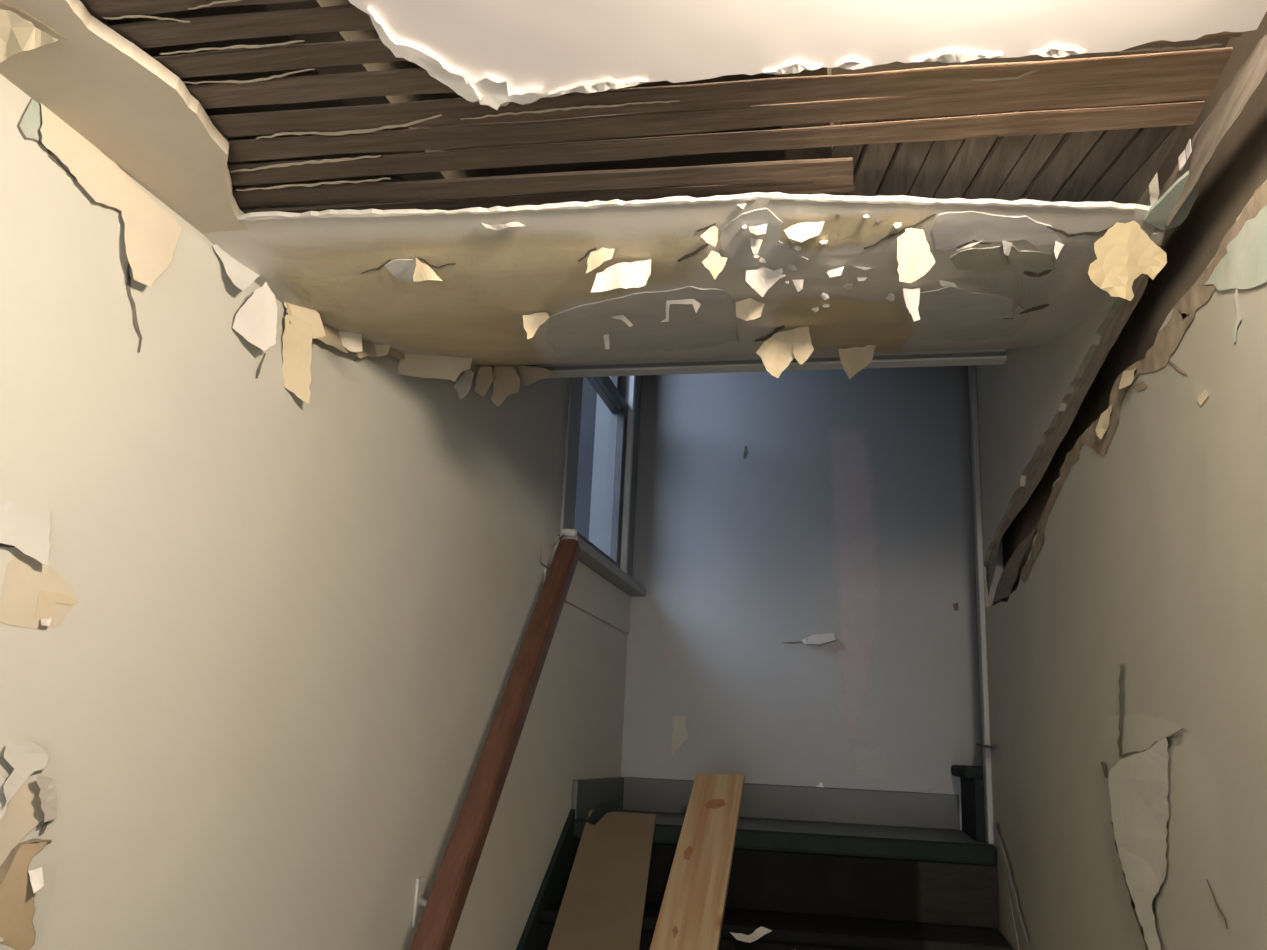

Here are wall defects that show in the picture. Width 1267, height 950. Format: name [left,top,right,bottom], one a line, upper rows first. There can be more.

crack [126,262,142,353]
peeling [213,198,1167,407]
spalling [1020,182,1267,582]
peeling [0,500,78,629]
peeling [0,741,57,950]
peeling [1101,665,1183,950]